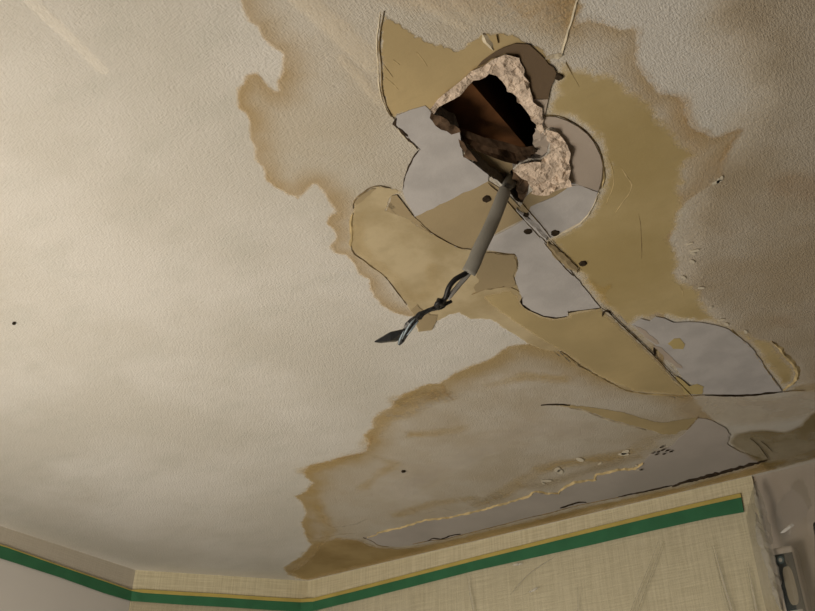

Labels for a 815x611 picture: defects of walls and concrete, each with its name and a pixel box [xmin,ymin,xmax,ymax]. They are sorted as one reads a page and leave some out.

crack [561,0,578,56]
peeling [387,33,603,317]
leakage [238,0,815,381]
leakage [284,344,815,579]
peeling [632,317,782,395]